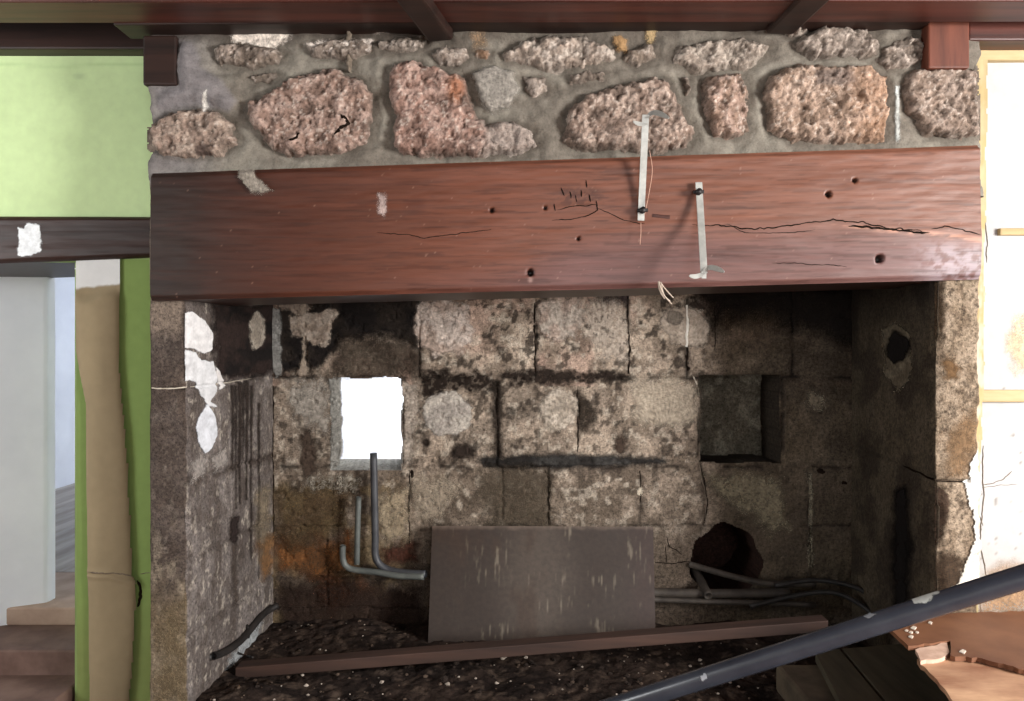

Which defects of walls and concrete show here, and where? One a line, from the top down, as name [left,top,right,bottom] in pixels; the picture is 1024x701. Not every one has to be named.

crack [377,229,491,239]
crack [559,204,645,224]
crack [692,218,988,262]
peeling [185,312,225,453]
spalling [881,320,913,394]
water stain [191,380,362,604]
crack [904,446,1014,574]
corrosion [259,529,354,615]